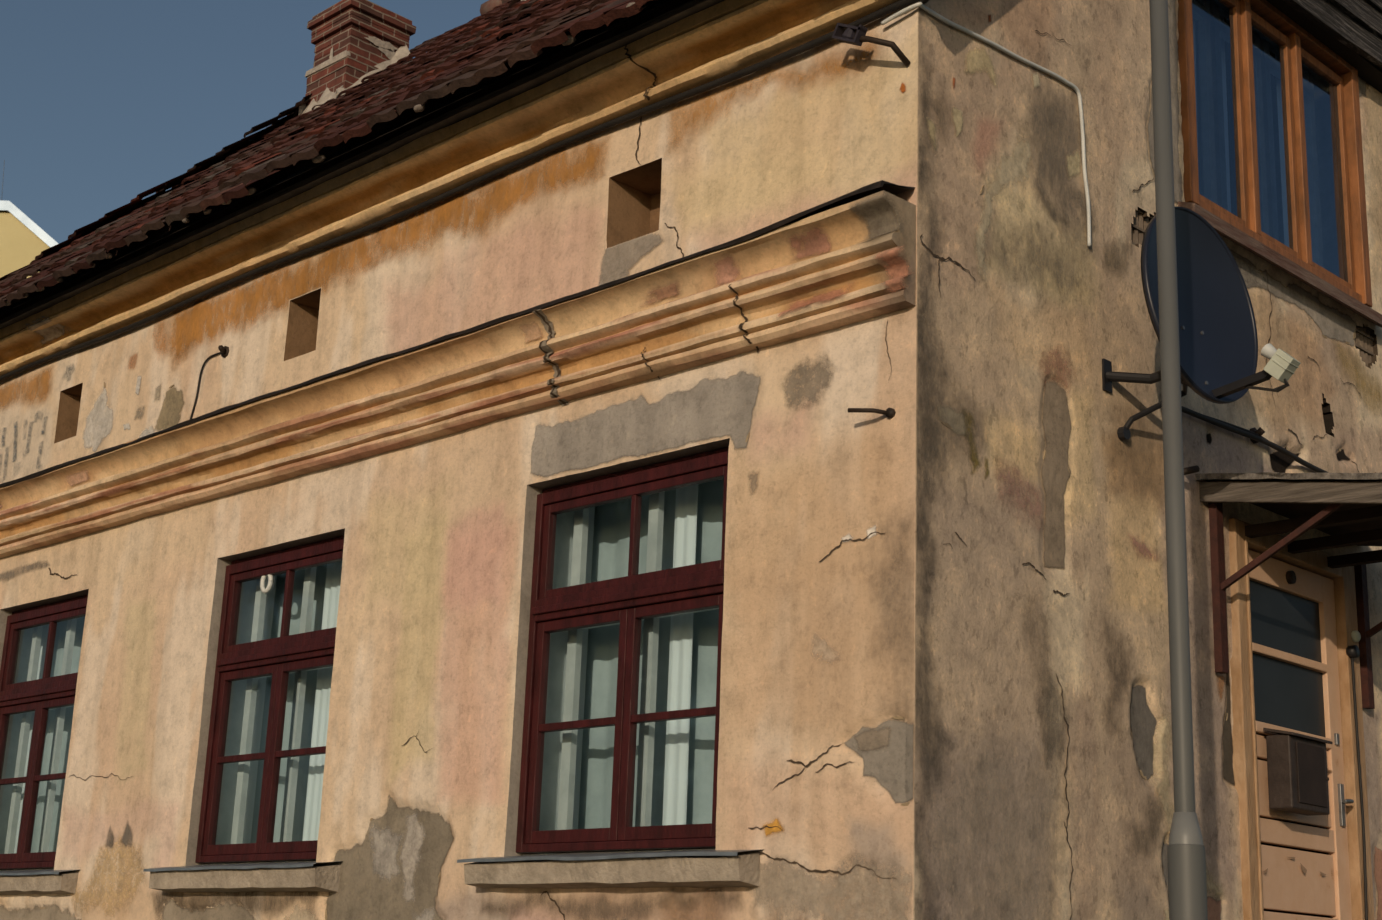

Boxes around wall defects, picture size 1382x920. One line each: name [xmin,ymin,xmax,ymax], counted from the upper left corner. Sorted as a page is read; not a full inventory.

crack [533,309,568,406]
crack [728,284,759,352]
spalling [1345,325,1375,367]
crack [774,744,851,788]
spalling [845,716,917,806]
crack [1056,674,1074,920]
spalling [1130,685,1174,888]
peeling [285,795,454,920]
crack [750,825,896,879]
peeling [163,899,254,920]
peeling [1206,870,1222,920]